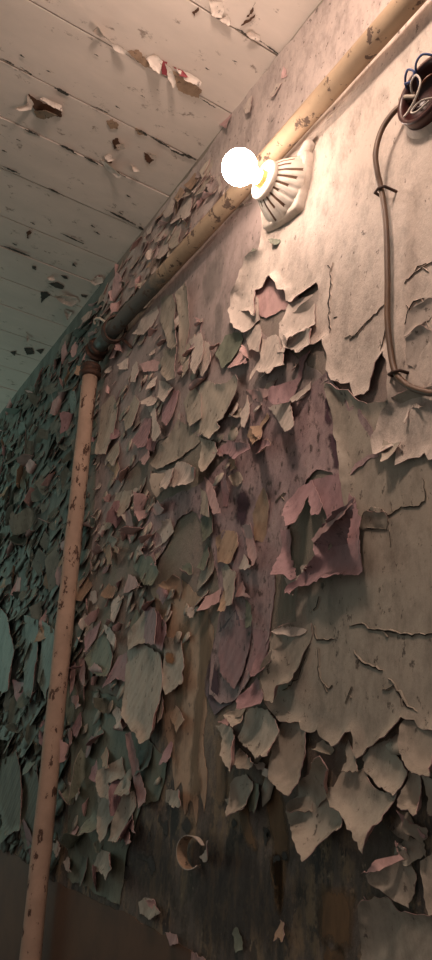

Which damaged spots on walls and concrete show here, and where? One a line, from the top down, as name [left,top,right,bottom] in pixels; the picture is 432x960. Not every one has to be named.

peeling [15,88,69,119]
peeling [60,106,156,178]
peeling [93,27,216,108]
crack [327,262,432,352]
peeling [0,128,222,864]
crack [361,479,427,547]
flaking render [49,197,432,960]
crack [282,596,432,712]